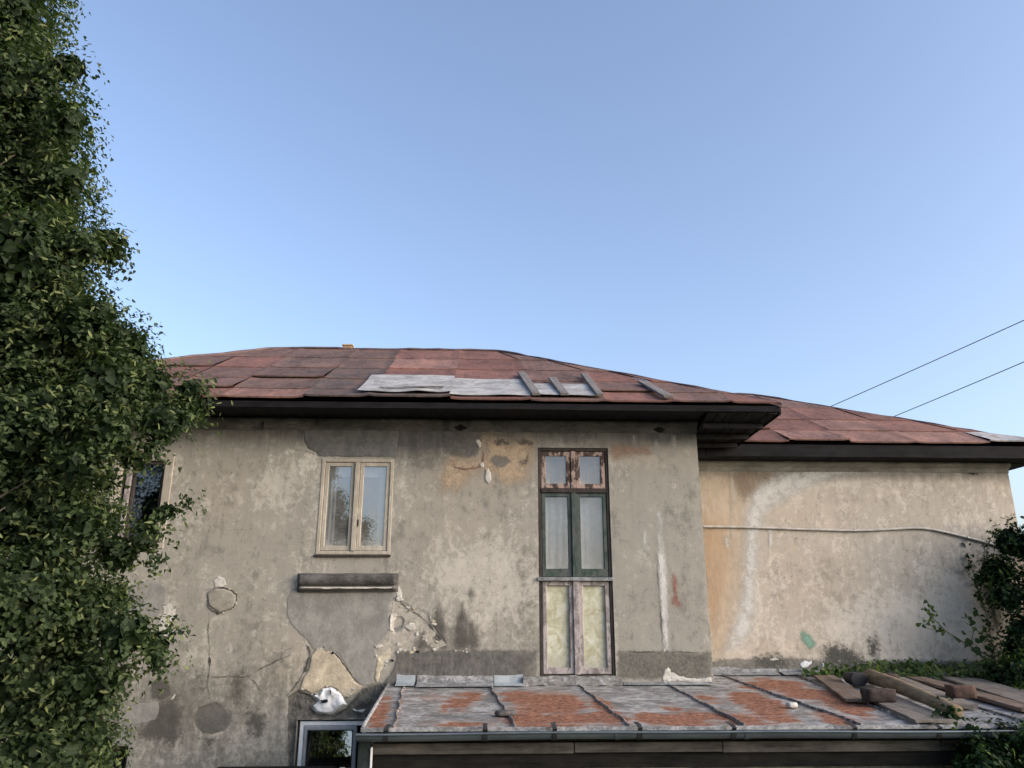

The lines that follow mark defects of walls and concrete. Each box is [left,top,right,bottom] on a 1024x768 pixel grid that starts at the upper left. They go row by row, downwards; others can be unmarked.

flaking render [441,436,534,490]
crack [207,615,311,698]
flaking render [287,572,447,766]